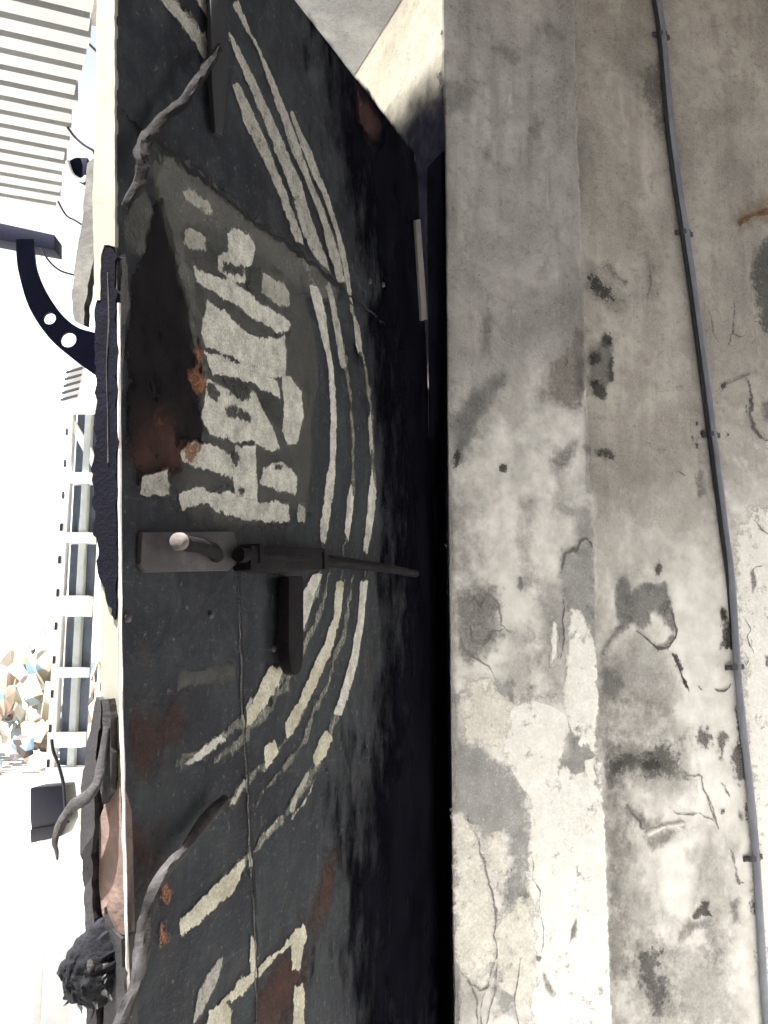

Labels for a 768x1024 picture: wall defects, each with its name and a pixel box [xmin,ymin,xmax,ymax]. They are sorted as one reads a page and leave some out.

rust [738,209,768,225]
crack [708,303,742,345]
rust [188,349,206,395]
water stain [551,331,614,405]
crack [721,371,768,441]
rust [128,409,201,480]
water stain [602,564,687,688]
crack [669,771,742,829]
rust [160,882,171,904]
crack [457,819,544,1024]
crack [731,850,755,922]